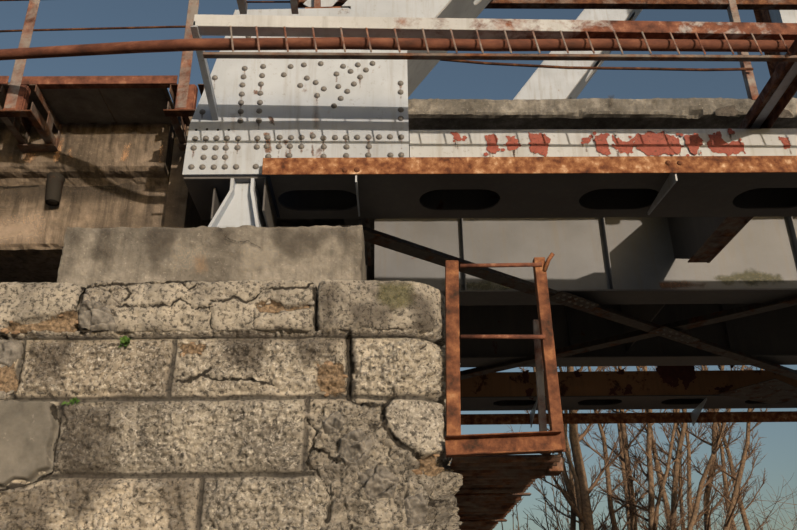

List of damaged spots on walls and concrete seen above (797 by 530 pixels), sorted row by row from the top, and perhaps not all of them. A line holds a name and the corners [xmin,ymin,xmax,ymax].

peeling [484,132,551,157]
peeling [581,128,746,156]
crack [76,280,318,329]
spalling [0,310,79,399]
crack [175,367,275,386]
spalling [316,360,348,397]
crack [345,332,422,460]
crack [305,419,337,523]
crack [419,483,445,530]